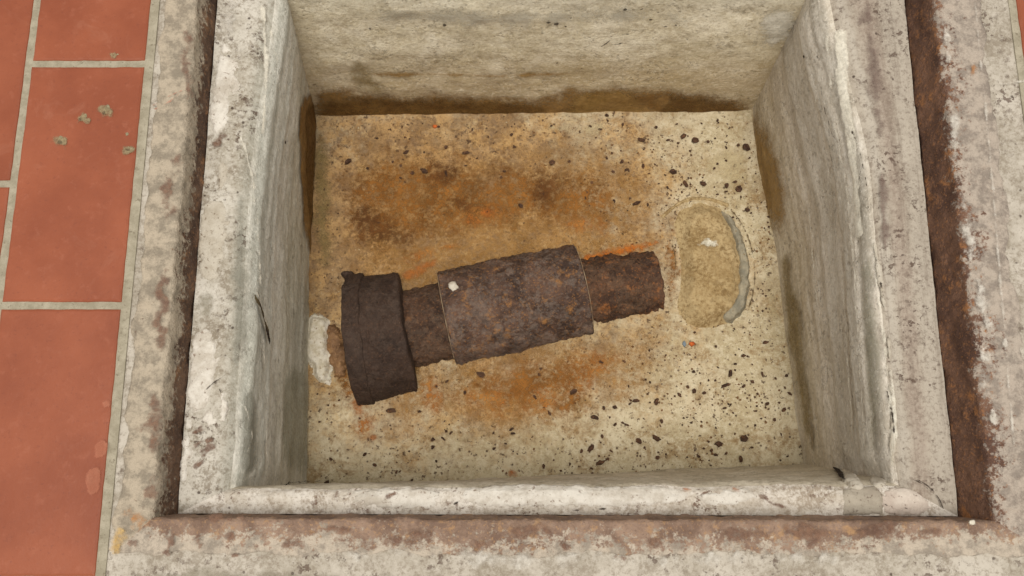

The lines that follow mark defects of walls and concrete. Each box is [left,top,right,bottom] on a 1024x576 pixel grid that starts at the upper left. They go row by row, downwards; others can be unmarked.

water stain [260,6,286,133]
water stain [277,64,784,253]
corrosion [346,162,680,288]
corrosion [404,347,636,422]